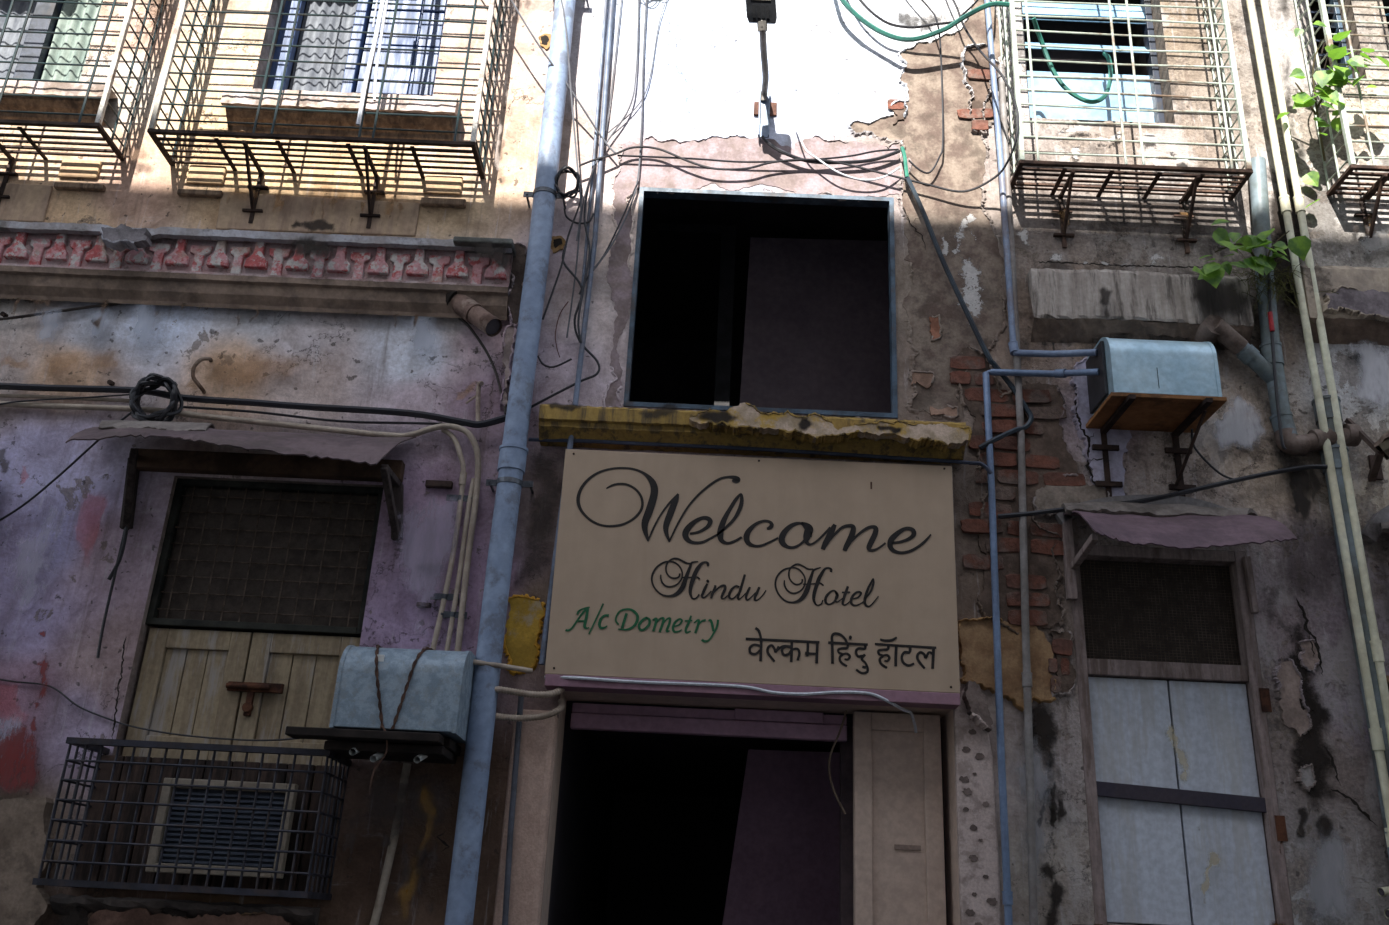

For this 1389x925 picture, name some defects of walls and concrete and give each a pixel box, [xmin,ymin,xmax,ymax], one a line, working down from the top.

spalling [602,0,1132,925]
peeling [0,657,55,925]
spalling [1271,639,1320,737]
spalling [1294,763,1317,792]